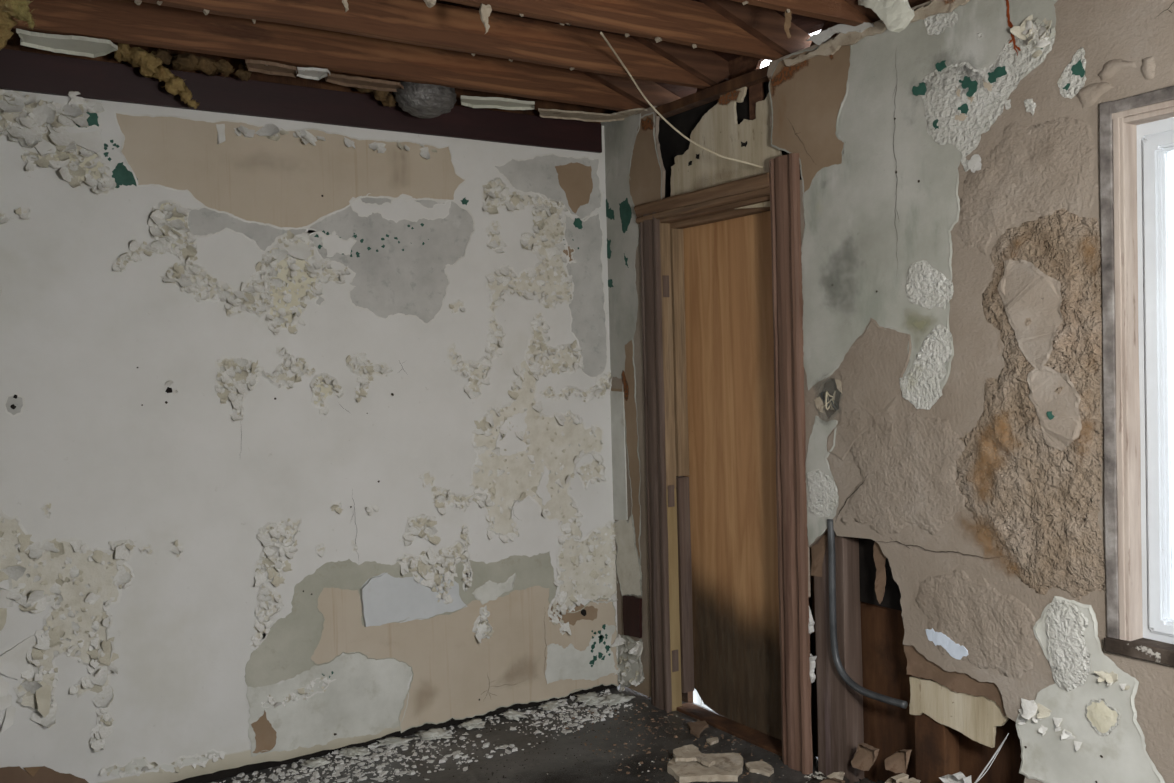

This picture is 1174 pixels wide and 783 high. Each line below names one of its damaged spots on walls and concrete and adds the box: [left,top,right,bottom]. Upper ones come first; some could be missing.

peeling [1010,14,1056,58]
flaking render [827,318,912,461]
peeling [0,89,645,757]
hole [859,538,902,611]
peeling [1094,671,1130,690]
peeling [1017,698,1083,751]
peeling [99,749,226,778]